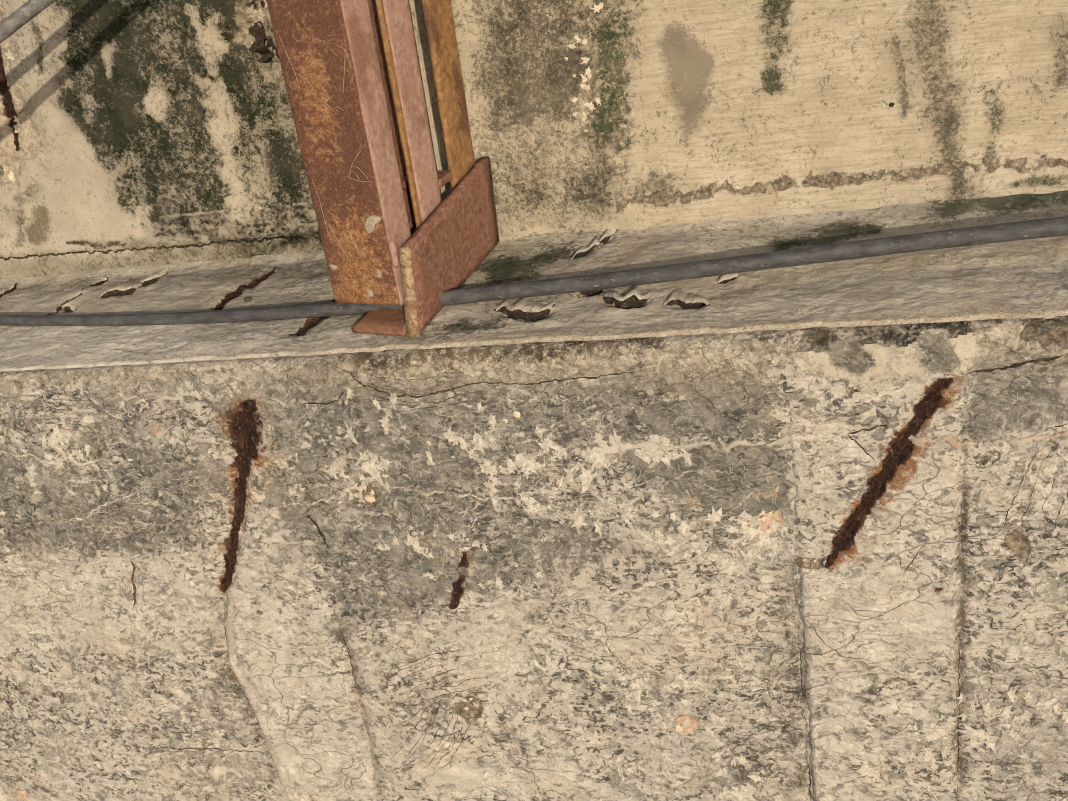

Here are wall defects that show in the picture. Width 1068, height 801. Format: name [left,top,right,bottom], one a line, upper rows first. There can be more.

leakage [662,27,714,137]
spalling [98,266,169,298]
spalling [494,297,556,322]
spalling [568,286,651,309]
spalling [664,288,711,309]
crack [304,365,644,409]
peeling [426,401,622,515]
peeling [633,434,693,466]
spalling [794,321,979,572]
peeling [376,531,443,581]
corrosion [448,551,472,610]
peeling [559,501,788,576]